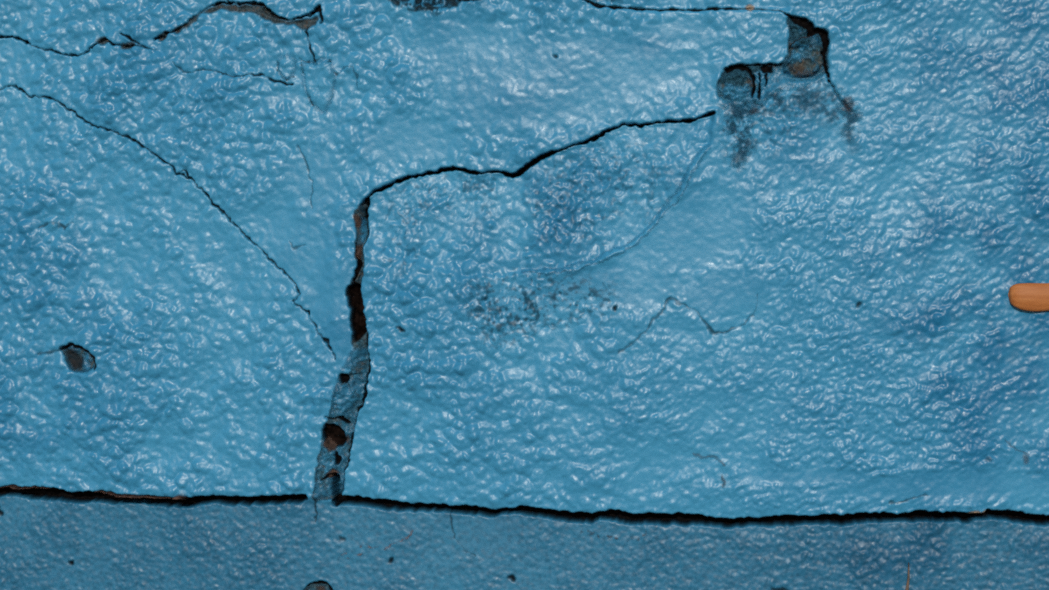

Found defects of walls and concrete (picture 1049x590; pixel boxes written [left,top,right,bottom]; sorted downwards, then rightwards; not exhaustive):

crack [0,0,324,63]
spalling [391,0,470,11]
crack [585,0,791,18]
crack [187,69,293,85]
spalling [718,16,829,103]
crack [362,112,715,204]
crack [1,86,336,360]
spalling [61,343,96,372]
spalling [312,200,371,500]
crack [0,476,1049,526]
spalling [305,581,333,590]